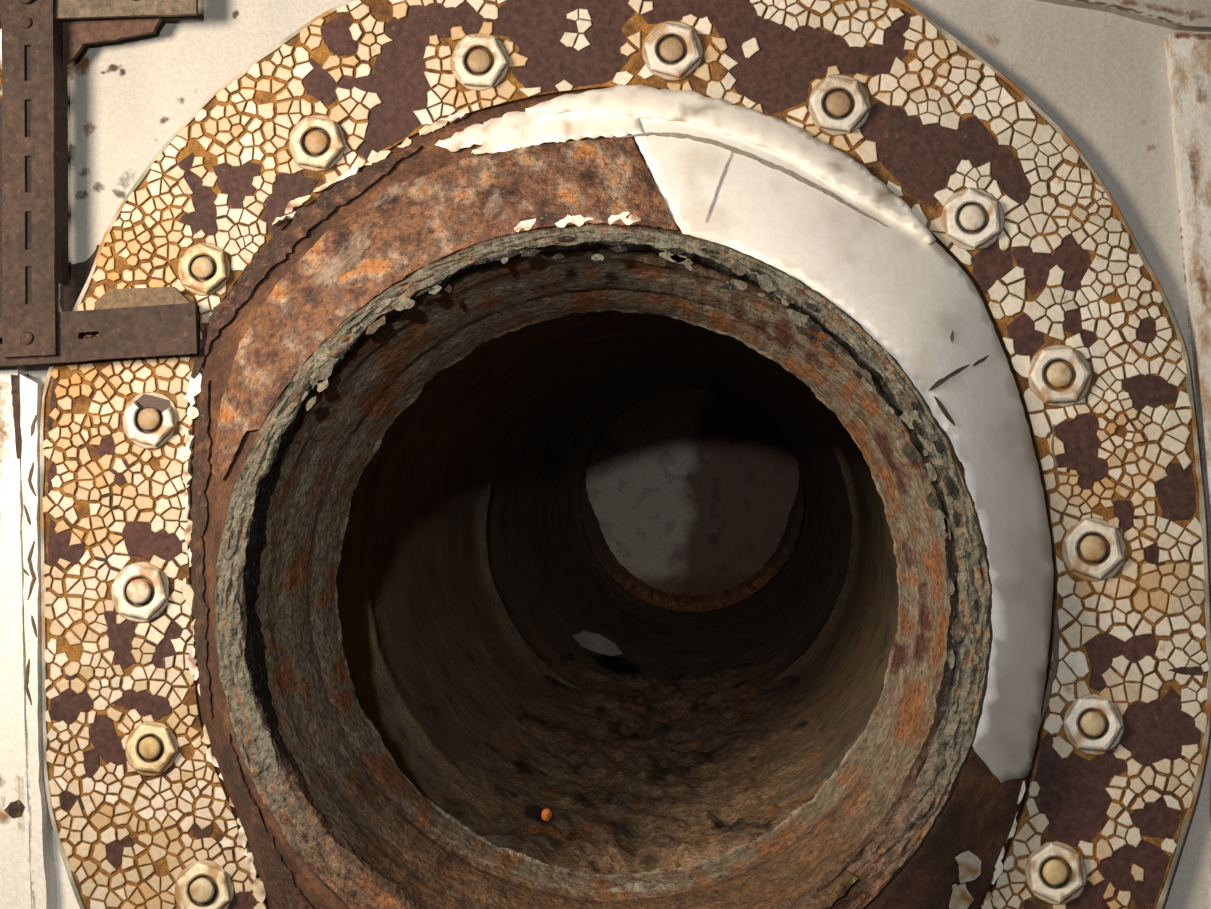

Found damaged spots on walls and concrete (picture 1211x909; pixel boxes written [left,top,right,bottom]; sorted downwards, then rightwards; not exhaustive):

corrosion [67,55,124,78]
peeling [216,76,286,120]
peeling [57,104,318,324]
crack [614,132,887,227]
crack [928,330,989,426]
corrosion [188,138,678,718]
peeling [247,0,1209,909]
crack [1050,424,1058,477]
crack [1039,607,1060,729]